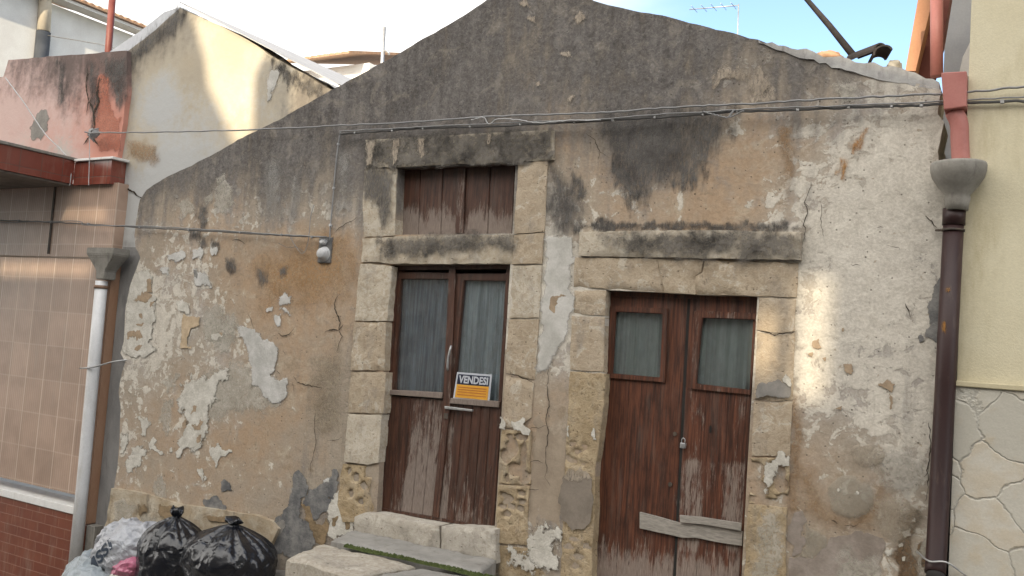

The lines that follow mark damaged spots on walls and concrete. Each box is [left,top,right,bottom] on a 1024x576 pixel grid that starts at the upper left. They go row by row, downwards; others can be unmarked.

crack [84,68,100,146]
damp [86,7,185,127]
damp [363,127,798,262]
damp [602,106,733,201]
crack [802,187,824,253]
corrosion [834,128,867,180]
peeling [122,246,218,358]
peeling [237,326,288,403]
crack [325,296,343,350]
peeling [120,367,232,483]
crack [506,368,550,490]
spalling [506,521,563,576]